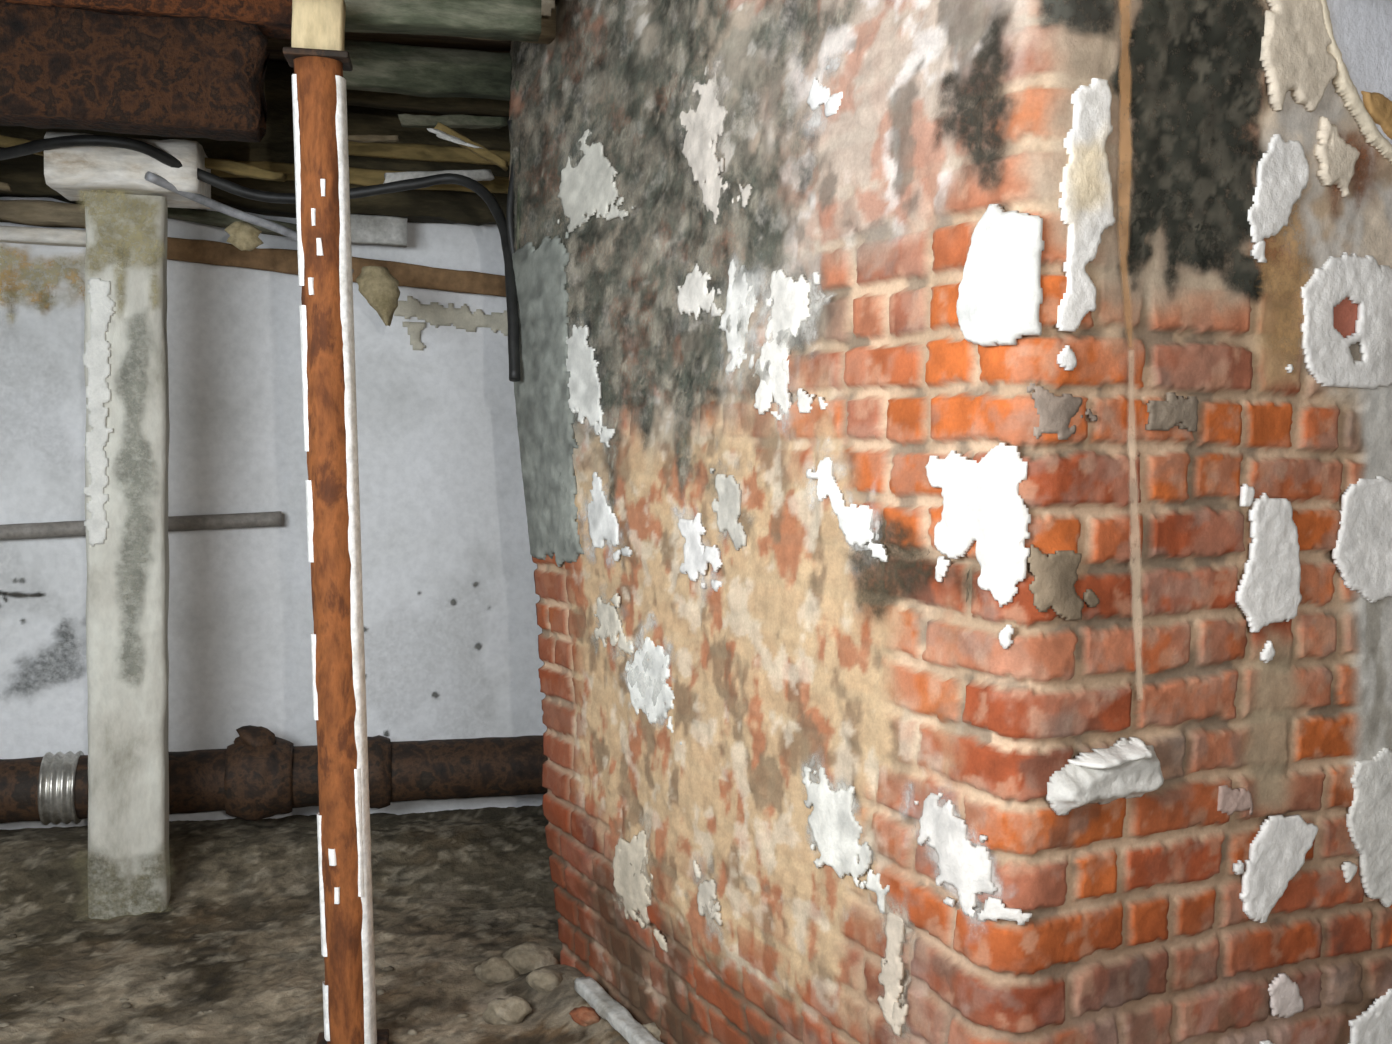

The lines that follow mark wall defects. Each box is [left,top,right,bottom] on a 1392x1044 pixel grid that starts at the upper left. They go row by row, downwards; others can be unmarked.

damp [0,189,162,317]
mould [510,0,851,505]
mould [936,17,1009,187]
damp [1040,0,1311,358]
peeling [1250,240,1267,263]
peeling [1260,0,1392,198]
peeling [1056,345,1077,371]
damp [117,316,153,682]
peeling [867,540,887,562]
peeling [925,443,1100,620]
peeling [1239,484,1255,506]
peeling [977,896,1032,925]